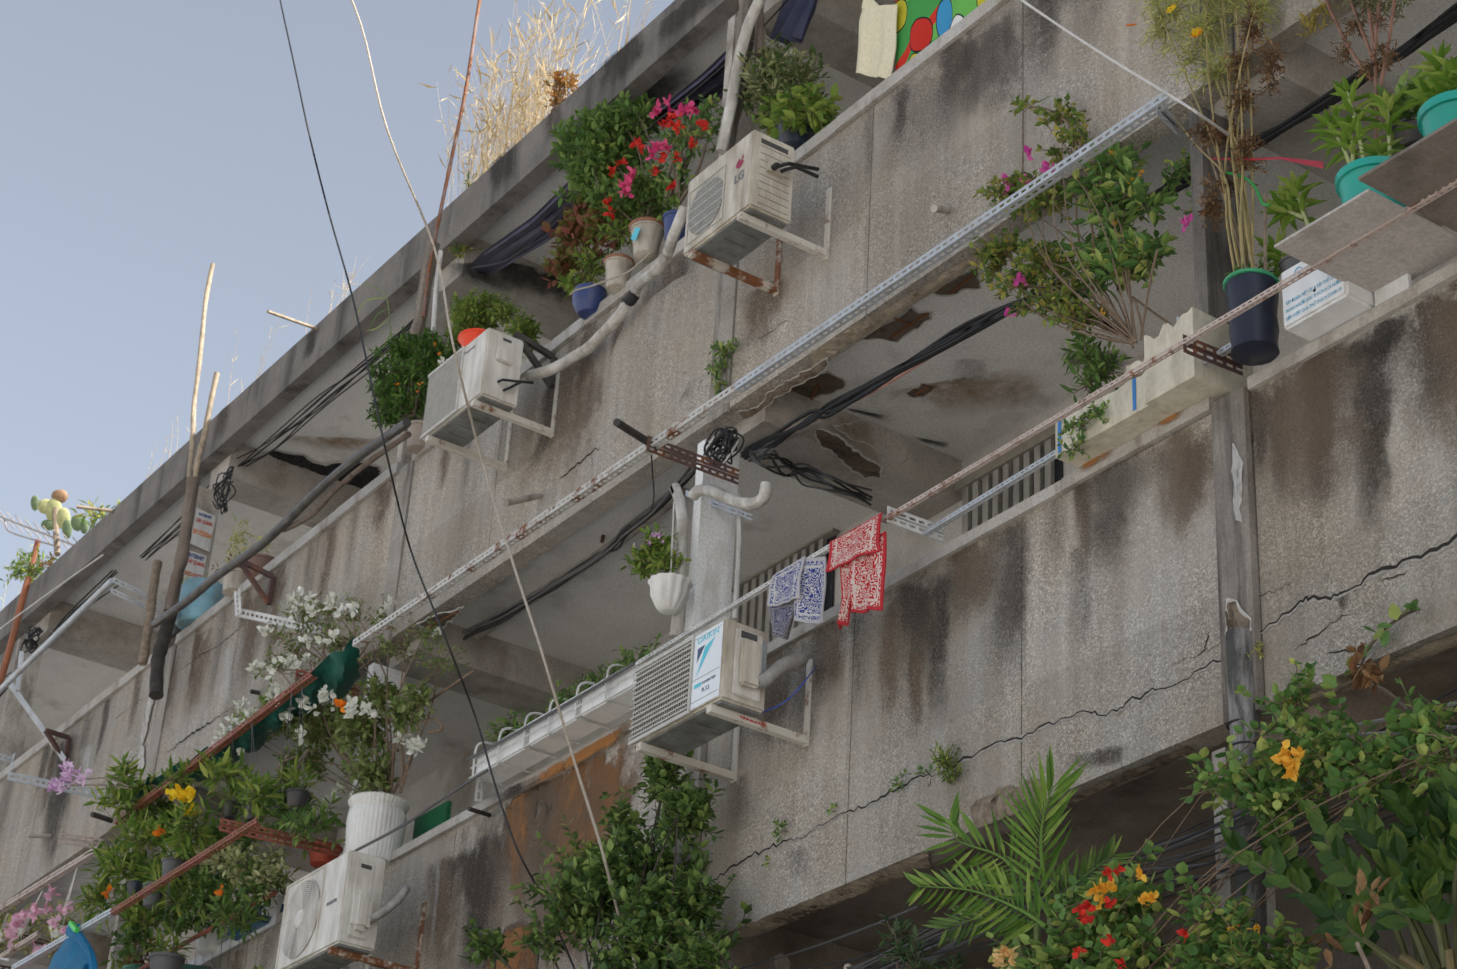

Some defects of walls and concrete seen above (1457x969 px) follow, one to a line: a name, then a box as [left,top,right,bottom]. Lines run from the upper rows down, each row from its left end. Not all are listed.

damp [764,652,789,723]
peeling [737,252,983,420]
damp [879,525,1026,707]
crack [709,632,1221,884]
damp [1074,469,1128,552]
damp [1161,430,1211,524]
damp [1249,283,1457,508]
crack [1259,533,1457,654]
rust [477,729,633,969]